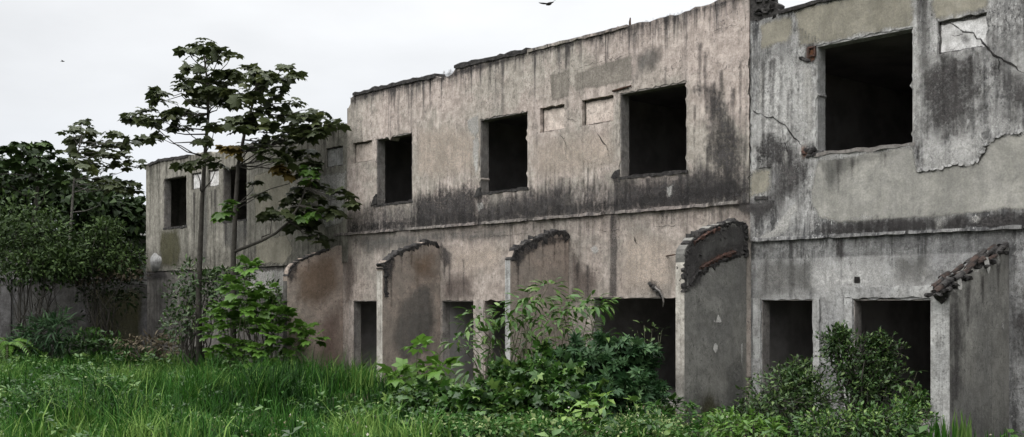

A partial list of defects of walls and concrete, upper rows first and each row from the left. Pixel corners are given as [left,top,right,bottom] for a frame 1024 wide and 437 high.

crack [713,25,801,185]
water stain [923,54,982,134]
crack [950,23,1023,74]
water stain [352,43,810,296]
peeling [801,129,1024,229]
spalling [627,205,798,297]
water stain [822,212,1024,256]